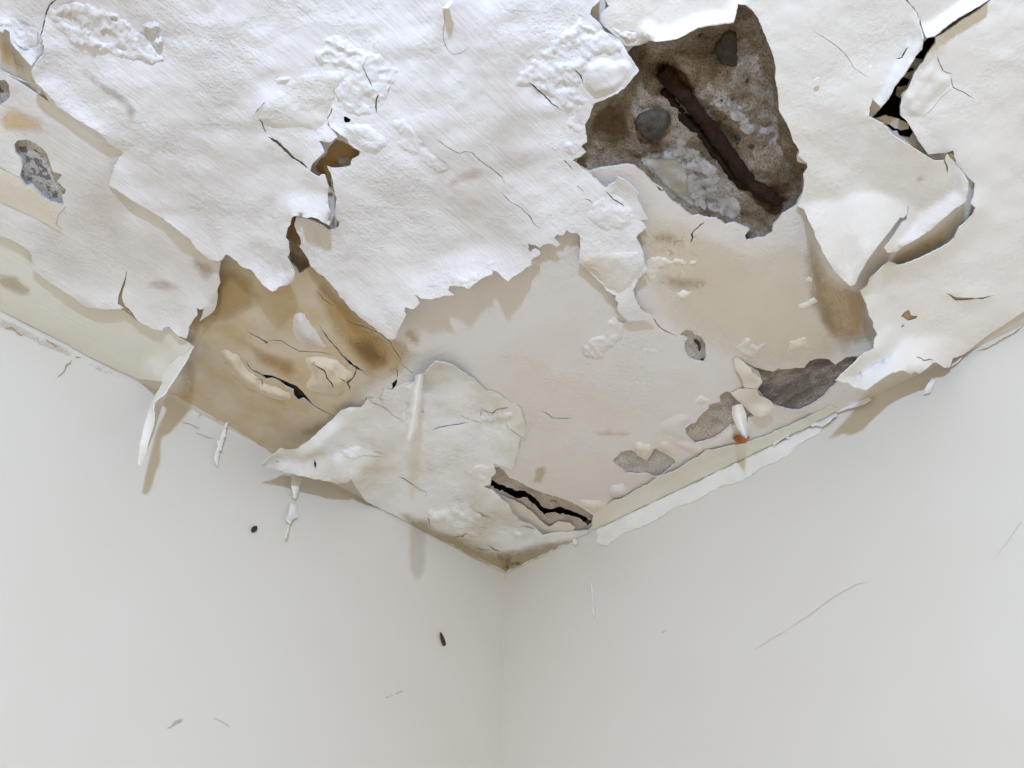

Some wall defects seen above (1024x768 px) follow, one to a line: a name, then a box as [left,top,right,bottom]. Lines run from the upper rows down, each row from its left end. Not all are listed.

crack [873,7,978,170]
crack [256,371,312,403]
damp [178,217,408,454]
peeling [0,0,1024,572]
crack [491,480,588,522]